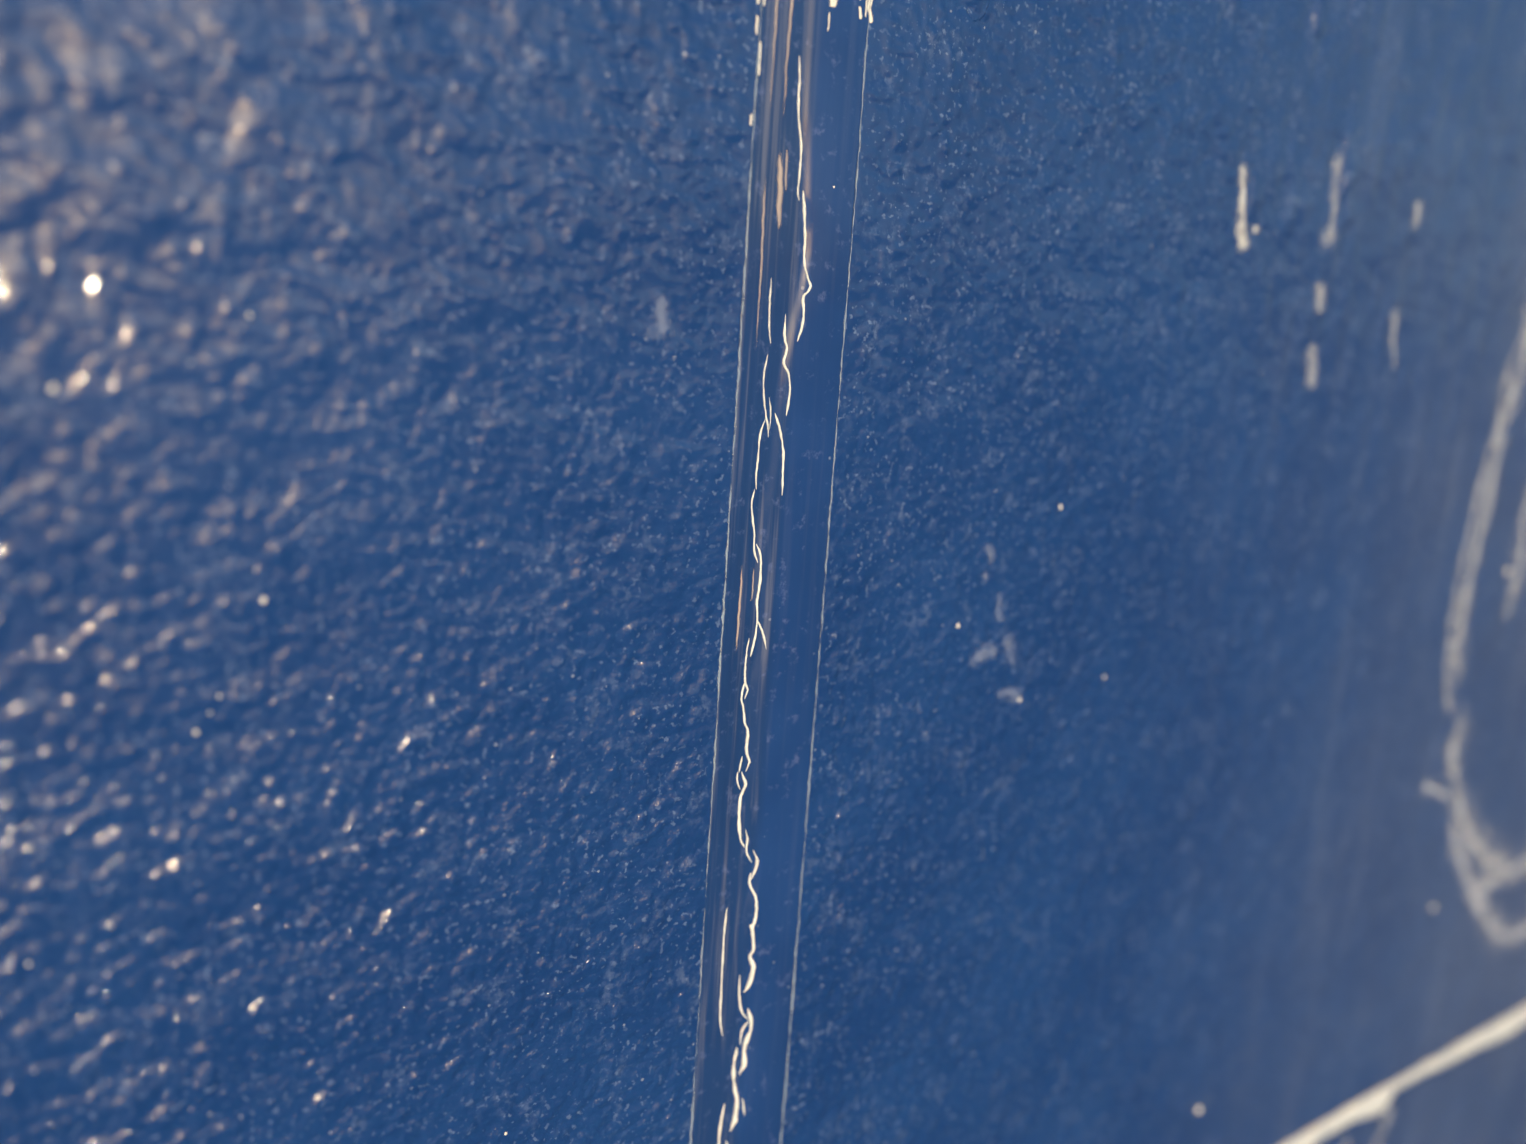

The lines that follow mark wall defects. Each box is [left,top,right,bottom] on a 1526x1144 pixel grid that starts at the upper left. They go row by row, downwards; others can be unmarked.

crack [718,56,812,1144]